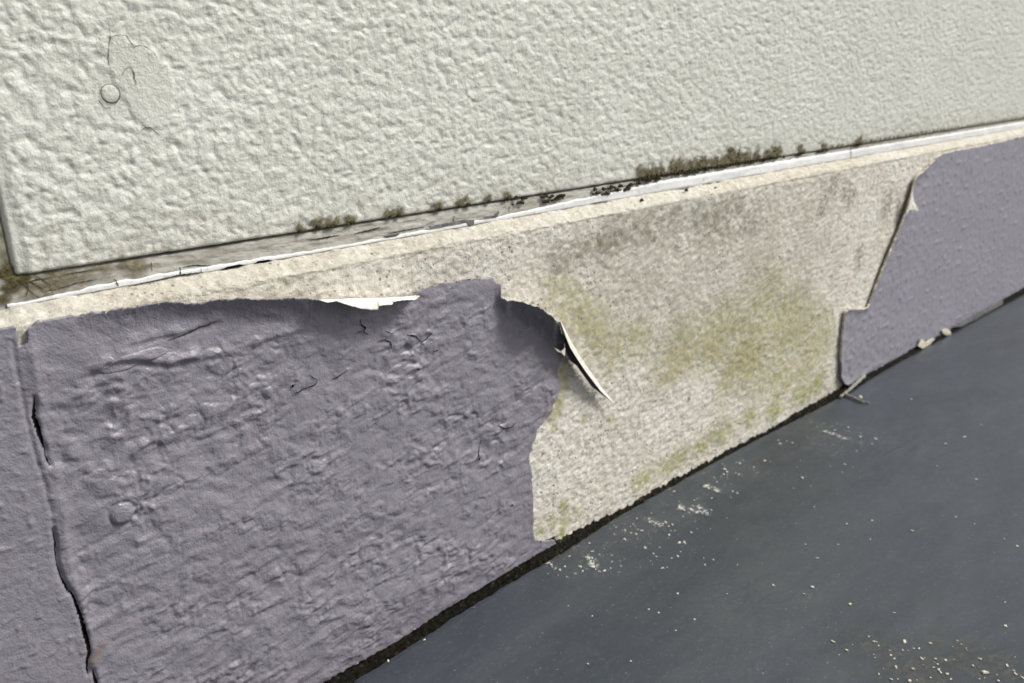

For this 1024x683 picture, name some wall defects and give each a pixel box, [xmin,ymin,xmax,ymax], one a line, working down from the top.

water stain [547,196,755,267]
peeling [17,331,28,345]
peeling [180,138,1014,541]
crack [32,397,51,465]
crack [52,529,98,683]